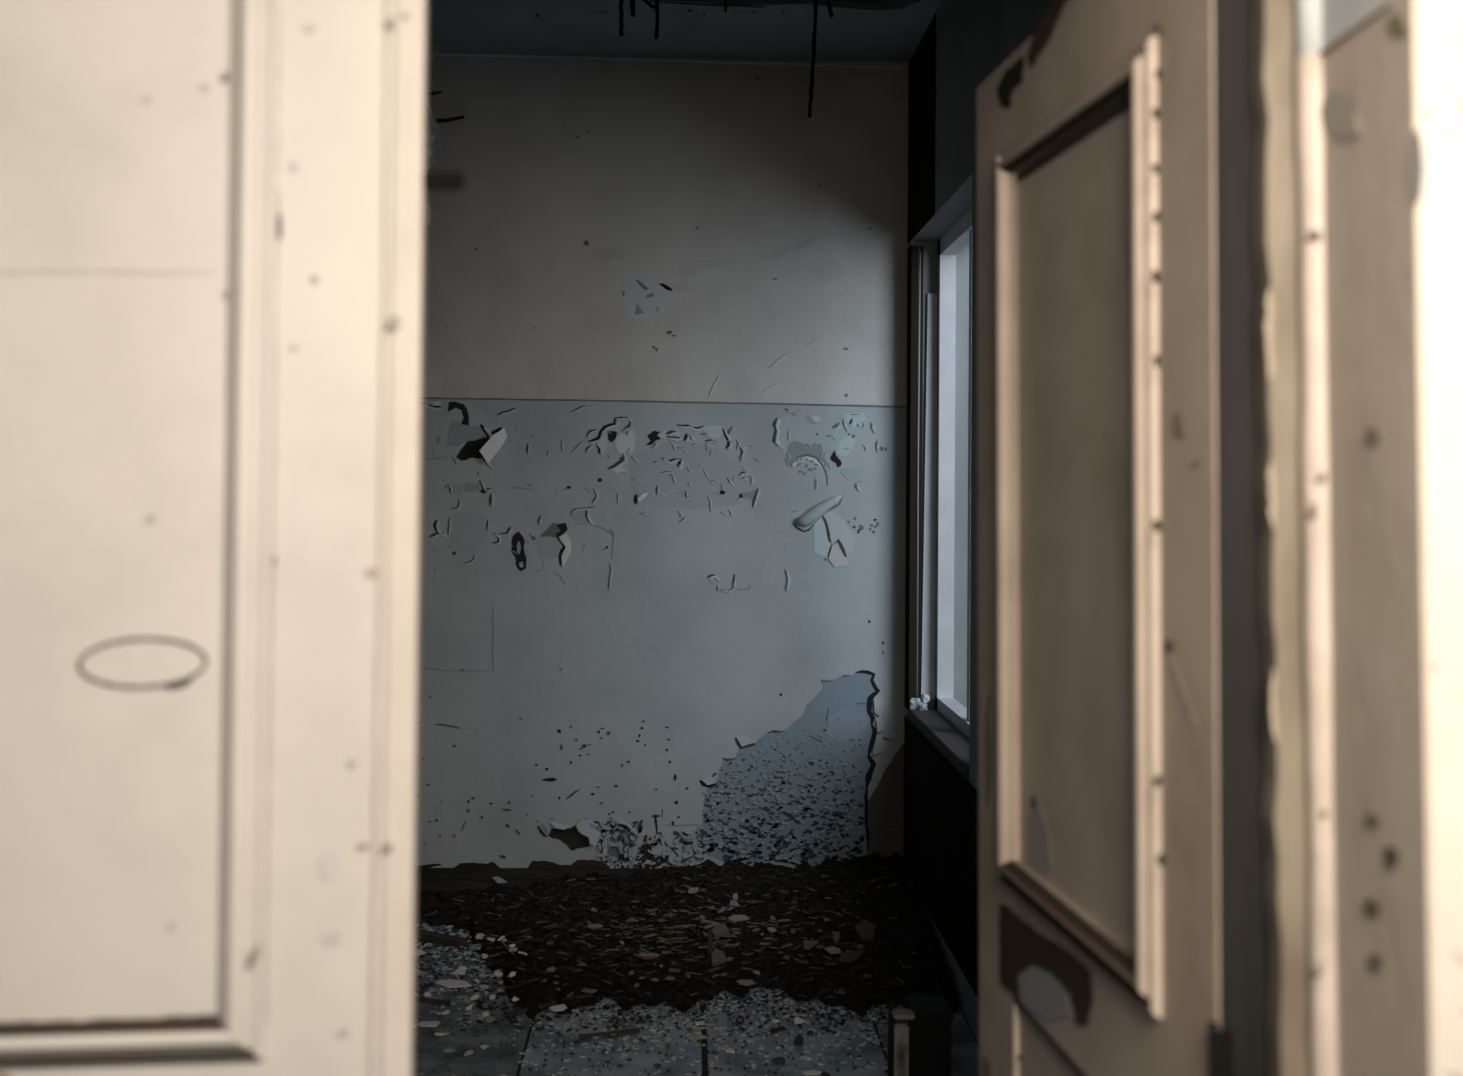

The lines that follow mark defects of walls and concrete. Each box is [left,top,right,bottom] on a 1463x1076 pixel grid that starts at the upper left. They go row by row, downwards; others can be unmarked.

peeling [432,401,490,461]
peeling [597,425,757,510]
peeling [777,412,867,486]
peeling [511,523,571,571]
peeling [813,511,854,567]
spalling [528,673,885,869]